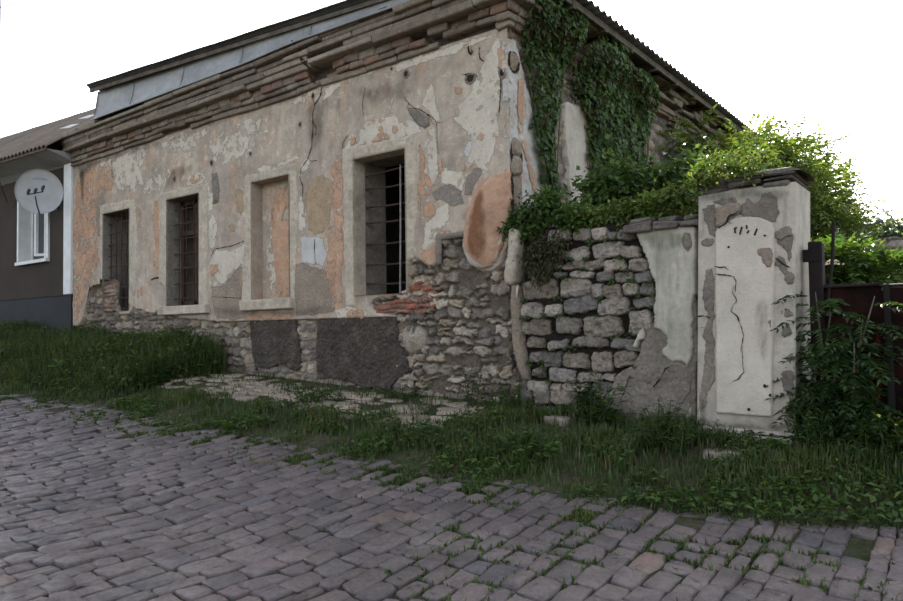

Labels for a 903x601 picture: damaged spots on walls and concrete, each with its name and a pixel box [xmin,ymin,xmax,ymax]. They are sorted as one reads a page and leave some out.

crack [291,40,322,194]
flaking render [72,32,548,403]
peeling [561,100,594,208]
peeling [607,192,795,422]
crack [697,266,744,383]